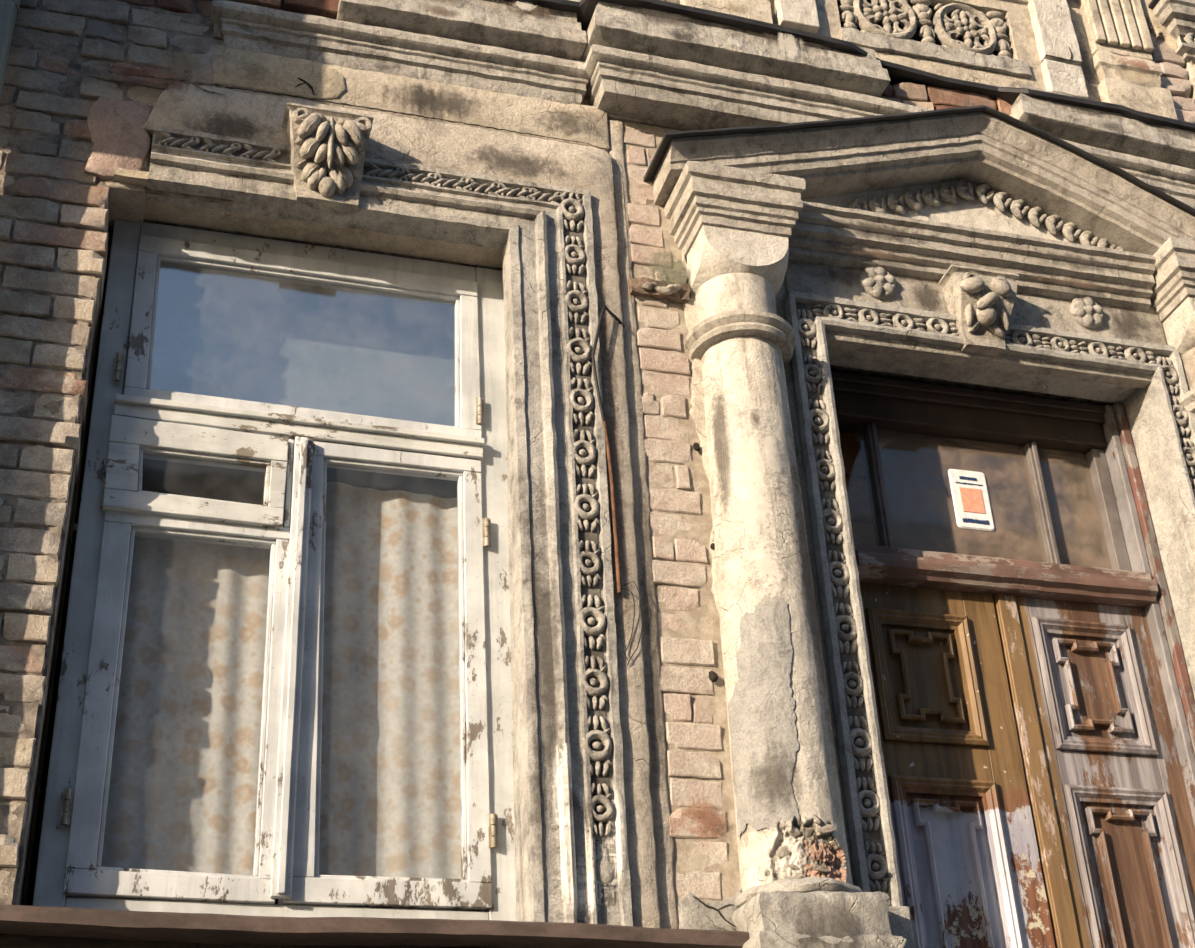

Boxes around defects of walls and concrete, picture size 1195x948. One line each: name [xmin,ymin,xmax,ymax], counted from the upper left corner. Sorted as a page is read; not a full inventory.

water stain [406,87,465,115]
water stain [755,754,788,802]
spalling [764,819,847,882]
crack [693,896,736,927]